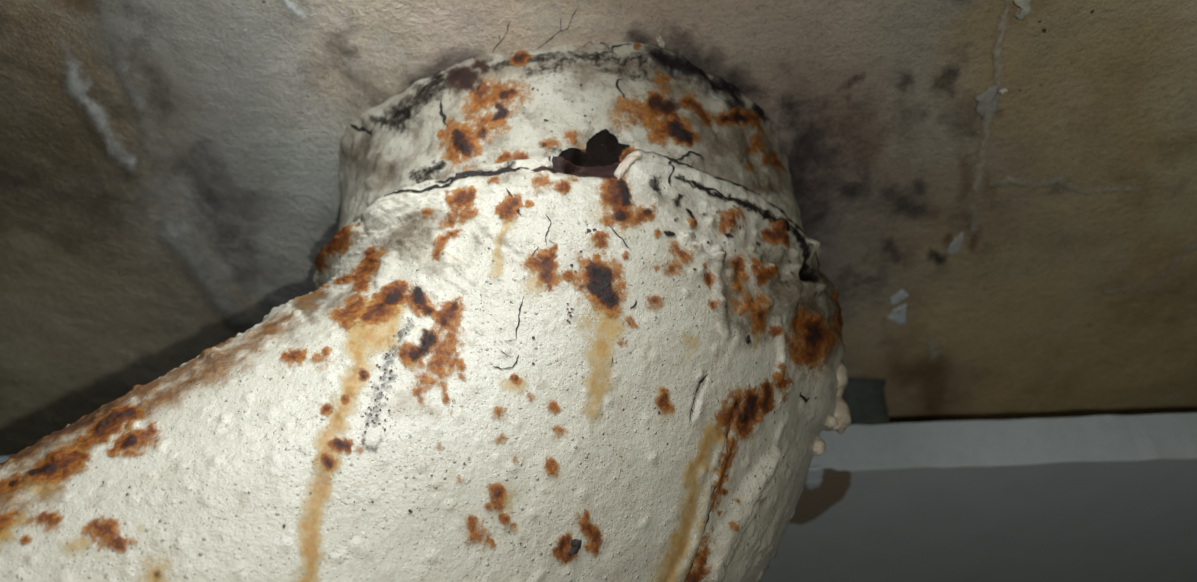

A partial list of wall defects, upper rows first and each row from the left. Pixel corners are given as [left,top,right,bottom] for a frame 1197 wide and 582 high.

damp [284,0,307,19]
crack [385,167,553,256]
rust [422,79,584,275]
peeling [614,147,642,180]
rust [610,71,787,172]
crack [636,149,825,333]
rust [0,225,466,582]
rust [504,374,535,401]
rust [523,176,845,582]